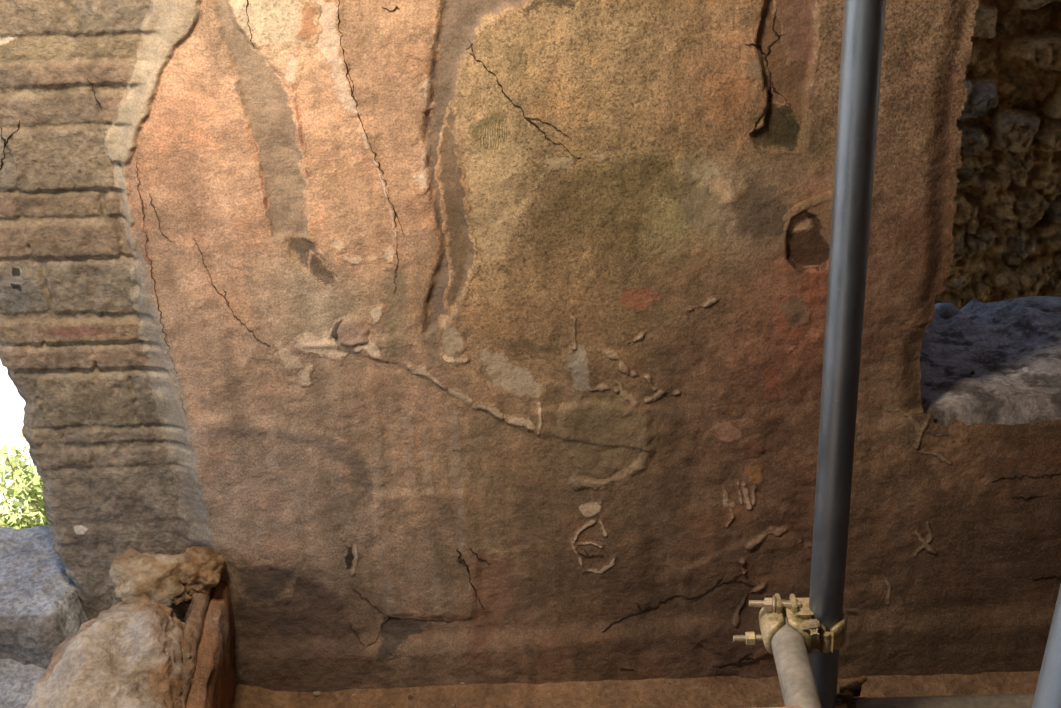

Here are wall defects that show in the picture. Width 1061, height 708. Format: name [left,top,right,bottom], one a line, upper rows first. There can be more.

crack [0,120,20,169]
flaking render [210,0,399,290]
crack [338,0,404,284]
flaking render [402,0,533,335]
crack [466,41,581,158]
flaking render [740,0,822,156]
crack [136,157,268,416]
flaking render [782,190,833,274]
flaking render [273,303,389,388]
flaking render [569,499,617,574]
crack [349,548,491,648]
crack [602,573,756,632]